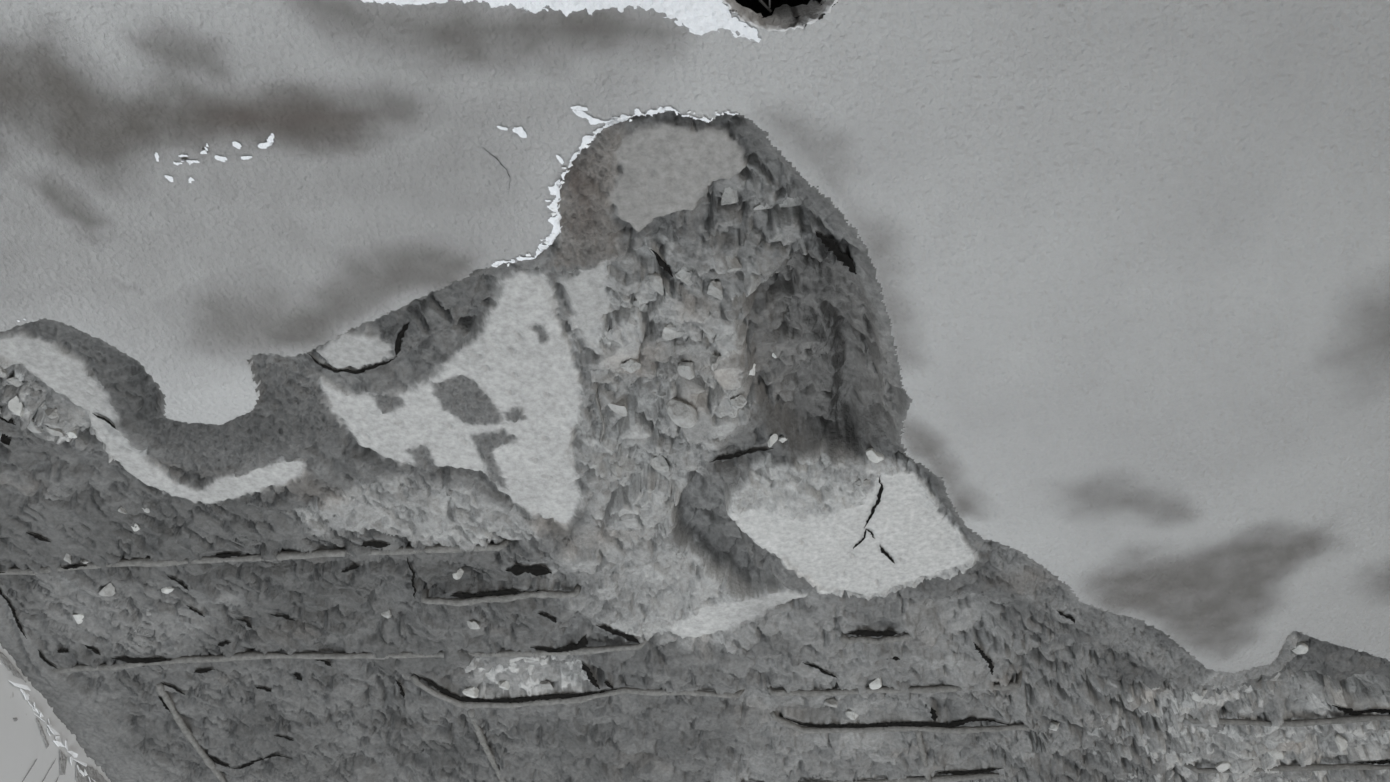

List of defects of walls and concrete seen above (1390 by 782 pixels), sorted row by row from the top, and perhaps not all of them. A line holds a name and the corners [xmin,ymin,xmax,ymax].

damp [0,54,329,156]
peeling [154,133,274,183]
peeling [568,106,679,168]
peeling [516,170,570,261]
spalling [8,396,25,417]
spalling [666,397,698,428]
spalling [421,584,581,607]
spalling [52,651,444,673]
spalling [468,638,647,657]
spalling [411,675,745,718]
spalling [156,683,227,782]
spalling [770,711,1033,768]